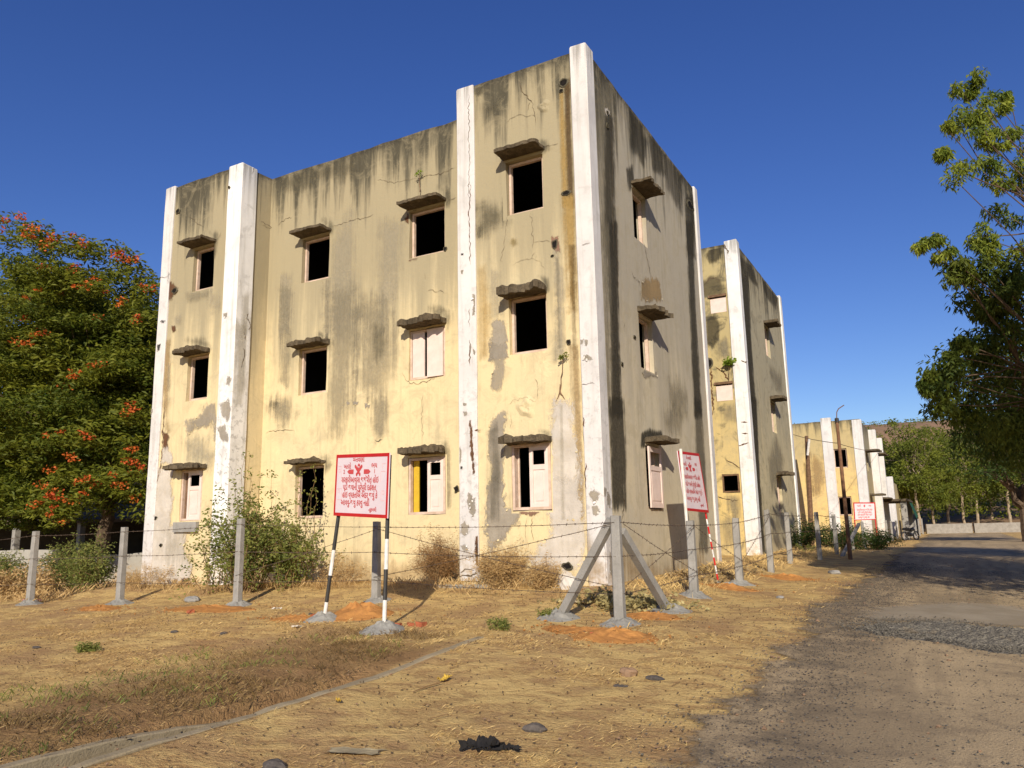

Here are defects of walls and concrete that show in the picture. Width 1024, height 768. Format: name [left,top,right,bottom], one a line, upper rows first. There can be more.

crack [379,103,471,265]
water stain [626,114,664,189]
water stain [597,93,626,510]
peeling [641,277,663,303]
peeling [488,319,508,390]
water stain [672,197,727,492]
peeling [185,399,230,460]
water stain [275,400,289,421]
water stain [374,401,387,442]
water stain [641,429,662,447]
peeling [453,397,611,585]
water stain [698,512,708,563]